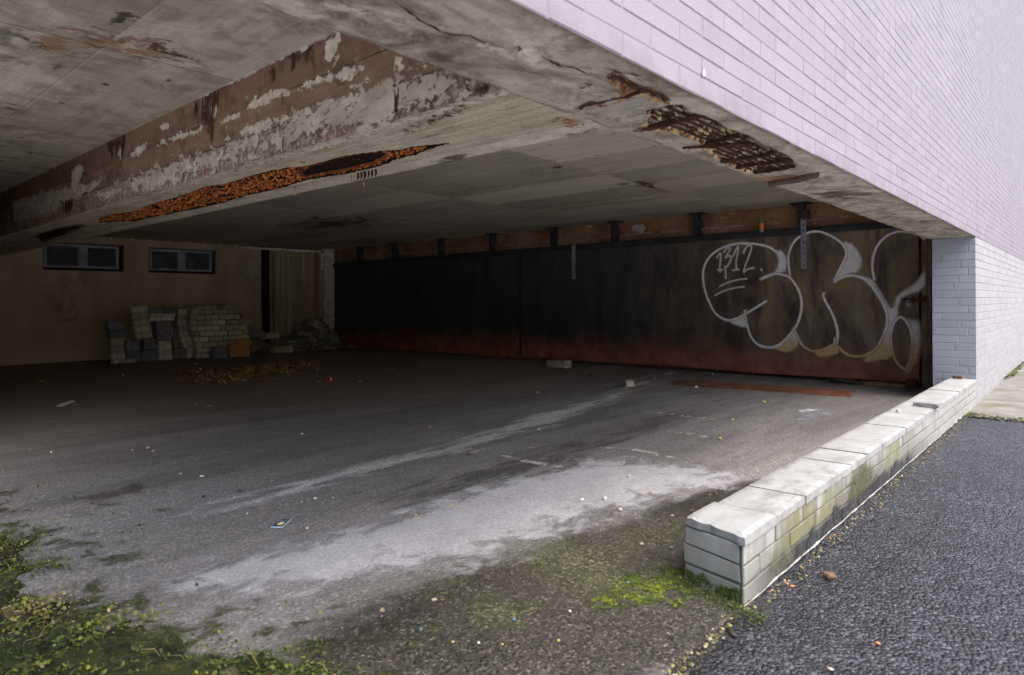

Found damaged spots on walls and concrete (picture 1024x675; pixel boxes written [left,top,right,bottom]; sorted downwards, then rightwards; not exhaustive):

damp [289,44,314,71]
crack [394,1,638,76]
damp [107,134,125,158]
damp [191,89,219,144]
spalling [4,32,509,237]
spalling [564,72,846,187]